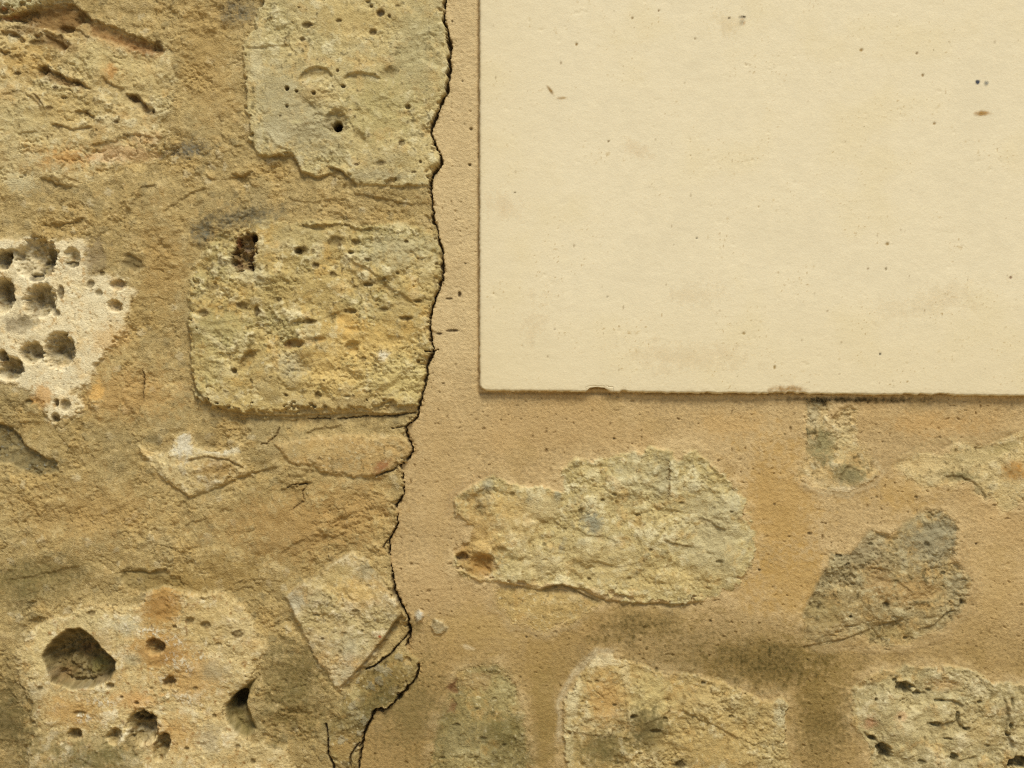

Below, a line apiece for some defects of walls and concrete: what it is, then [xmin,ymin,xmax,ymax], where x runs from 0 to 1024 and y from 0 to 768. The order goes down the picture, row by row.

crack [304,0,453,768]